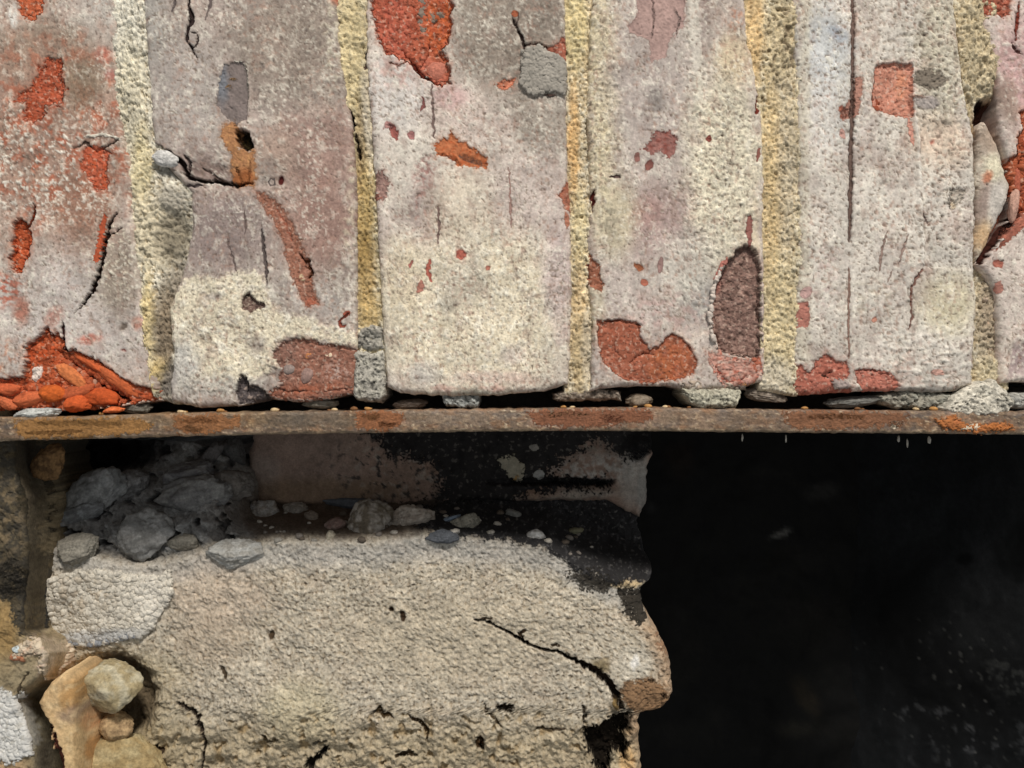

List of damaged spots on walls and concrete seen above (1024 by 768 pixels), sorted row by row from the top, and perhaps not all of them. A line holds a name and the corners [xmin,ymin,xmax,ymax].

spalling [371,0,454,87]
crack [847,0,856,242]
crack [170,151,269,283]
crack [61,213,122,352]
spalling [597,247,763,388]
spalling [0,328,163,413]
spalling [236,338,360,404]
rust [13,415,154,440]
rust [354,410,406,433]
rust [781,410,910,432]
rust [934,414,1015,436]
crack [476,617,624,711]